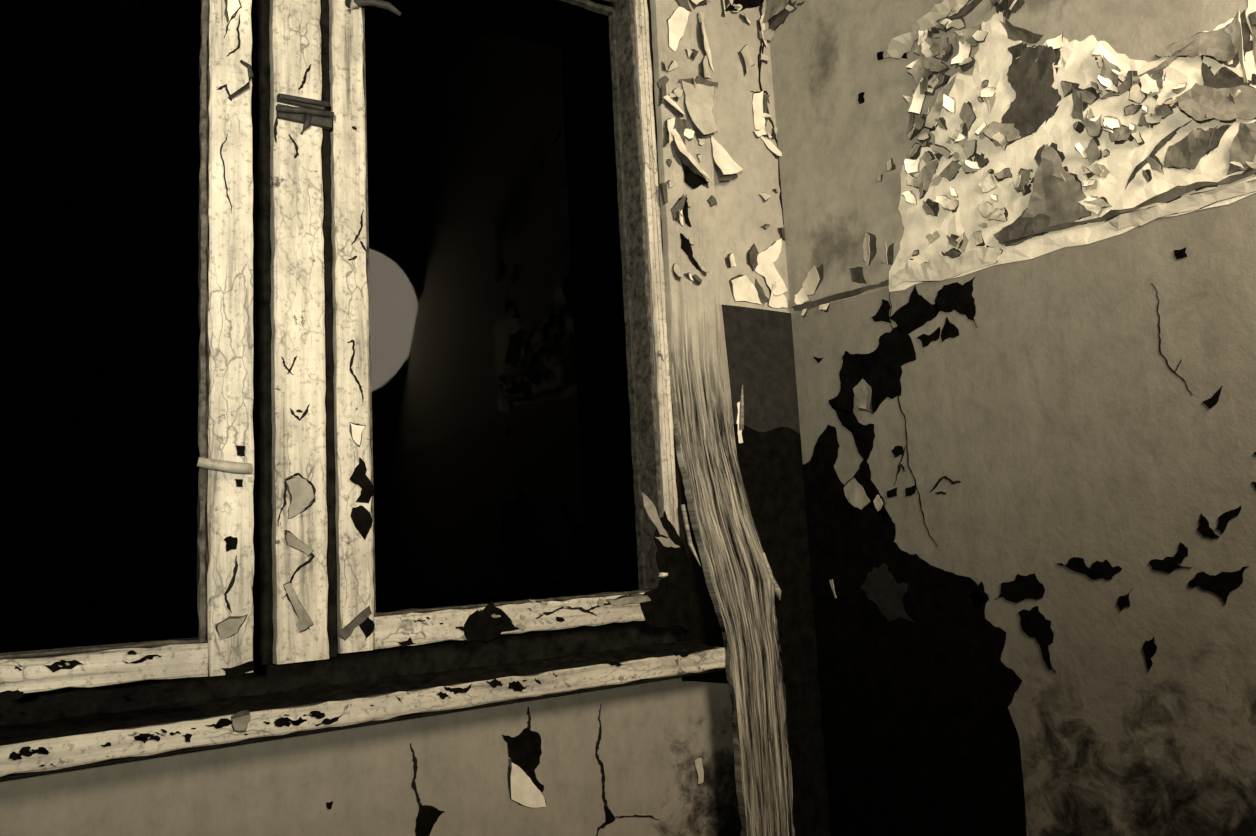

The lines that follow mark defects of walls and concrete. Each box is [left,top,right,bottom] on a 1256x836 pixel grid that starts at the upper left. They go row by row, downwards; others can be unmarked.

peeling [657,0,774,285]
peeling [722,0,1256,836]
peeling [349,422,375,540]
peeling [215,536,248,640]
peeling [278,473,316,633]
peeling [398,593,657,648]
flaking render [675,474,728,684]
peeling [133,710,342,753]
crack [410,743,445,836]
spalling [502,707,547,808]
crack [595,704,659,836]
crack [694,757,704,785]